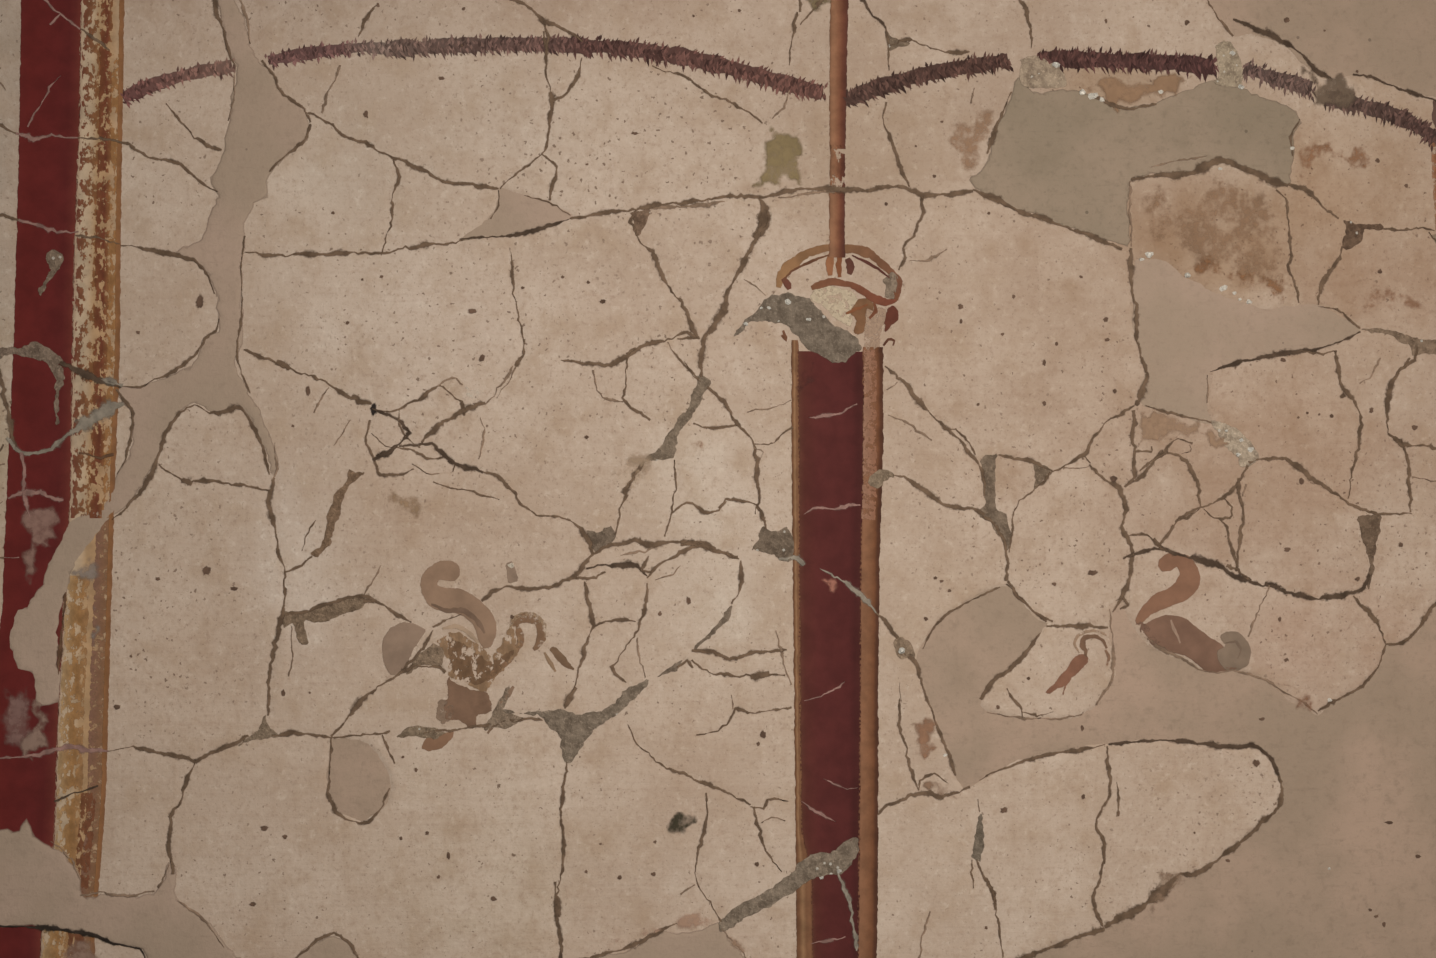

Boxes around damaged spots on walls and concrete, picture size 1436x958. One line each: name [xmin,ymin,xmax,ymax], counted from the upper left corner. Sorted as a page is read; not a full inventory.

peeling [0,0,101,518]
flaking render [734,292,862,363]
crack [236,0,1436,720]
peeling [54,576,90,866]
crack [112,404,411,716]
crack [272,614,461,825]
crack [554,725,858,958]
crack [677,632,845,736]
flaking render [719,837,859,932]
flaking render [894,637,915,659]
flaking render [971,814,984,861]
crack [878,653,1284,958]